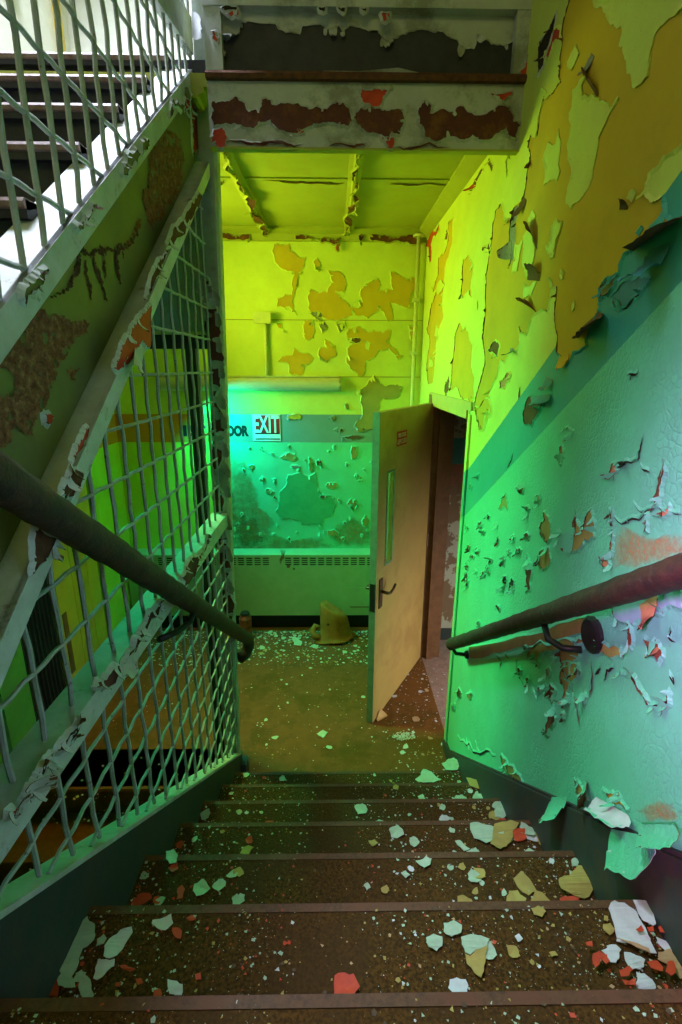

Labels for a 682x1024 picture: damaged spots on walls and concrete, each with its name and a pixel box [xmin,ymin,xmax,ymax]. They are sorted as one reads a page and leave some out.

peeling [167,0,682,432]
peeling [111,302,152,376]
peeling [40,409,54,429]
peeling [180,243,415,622]
peeling [461,482,616,613]
peeling [642,459,674,535]
peeling [90,597,166,692]
peeling [469,590,682,739]
peeling [3,713,86,826]
peeling [166,836,198,872]
peeling [131,867,245,939]
peeling [415,753,679,902]